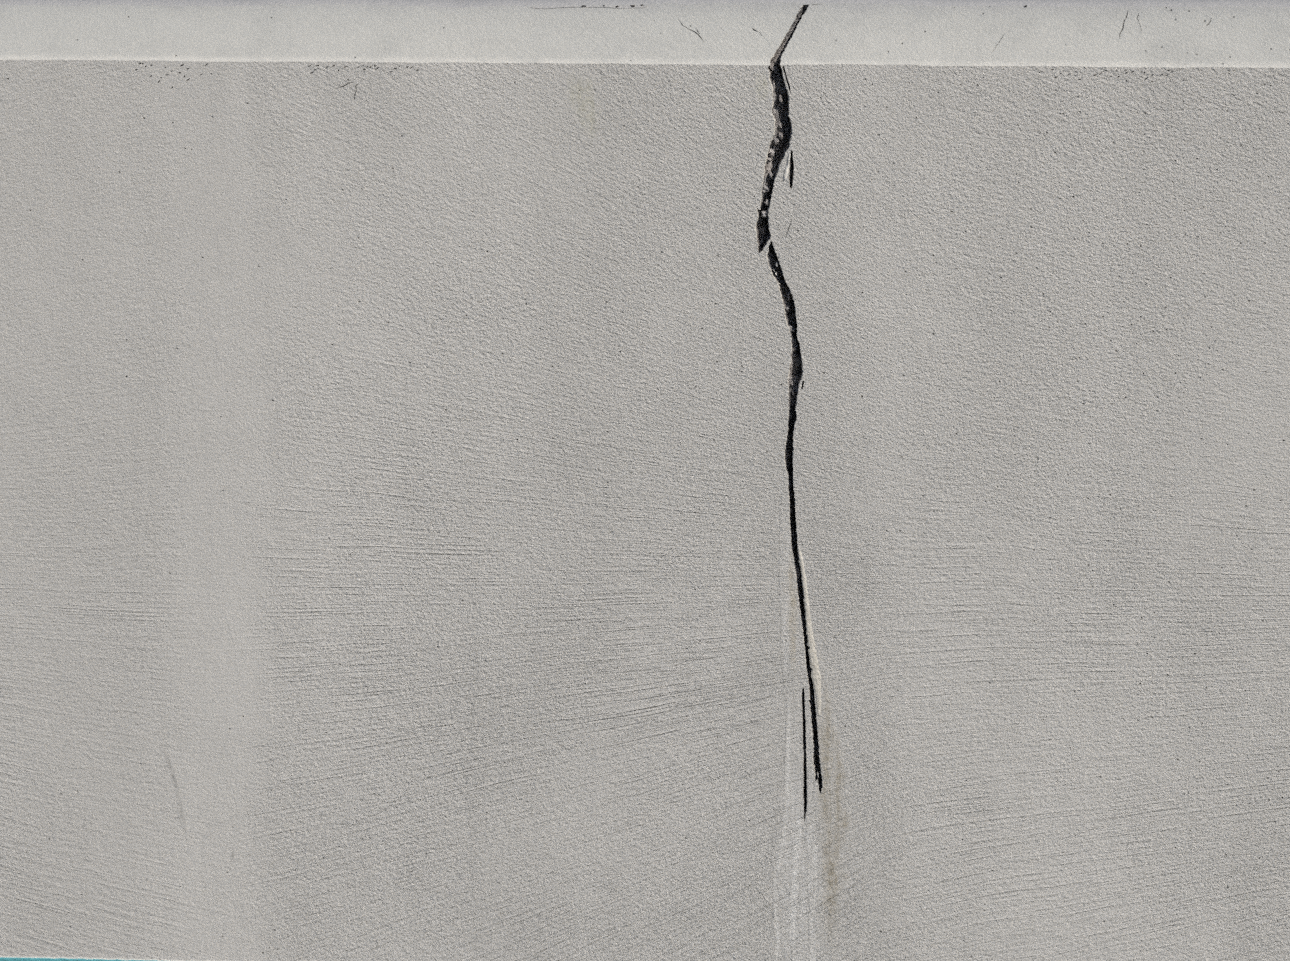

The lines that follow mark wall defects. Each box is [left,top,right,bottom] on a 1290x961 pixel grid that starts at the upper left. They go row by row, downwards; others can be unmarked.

crack [755,4,823,822]
leakage [763,493,855,961]